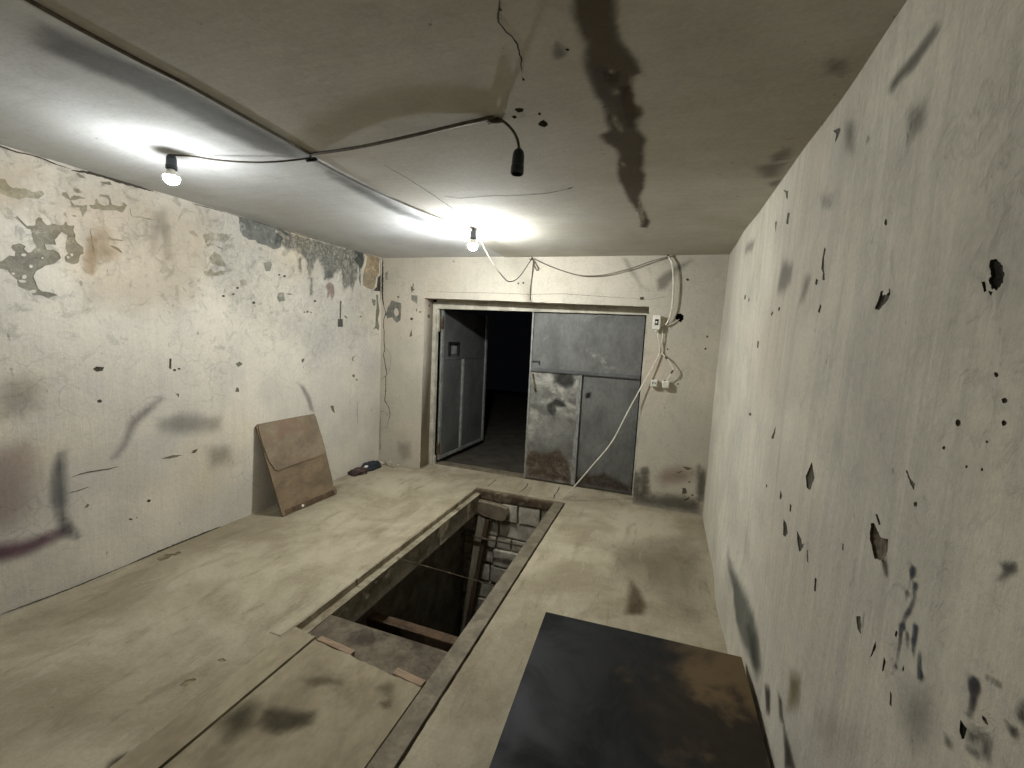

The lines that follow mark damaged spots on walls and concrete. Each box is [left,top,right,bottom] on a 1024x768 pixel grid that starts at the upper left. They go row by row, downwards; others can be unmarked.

crack [497,2,522,70]
damp [575,0,649,228]
flaking render [0,173,127,298]
flaking render [875,289,890,310]
flaking render [982,259,1005,295]
damp [633,470,705,510]
flaking render [806,463,815,489]
flaking render [870,514,888,563]
damp [898,566,923,679]